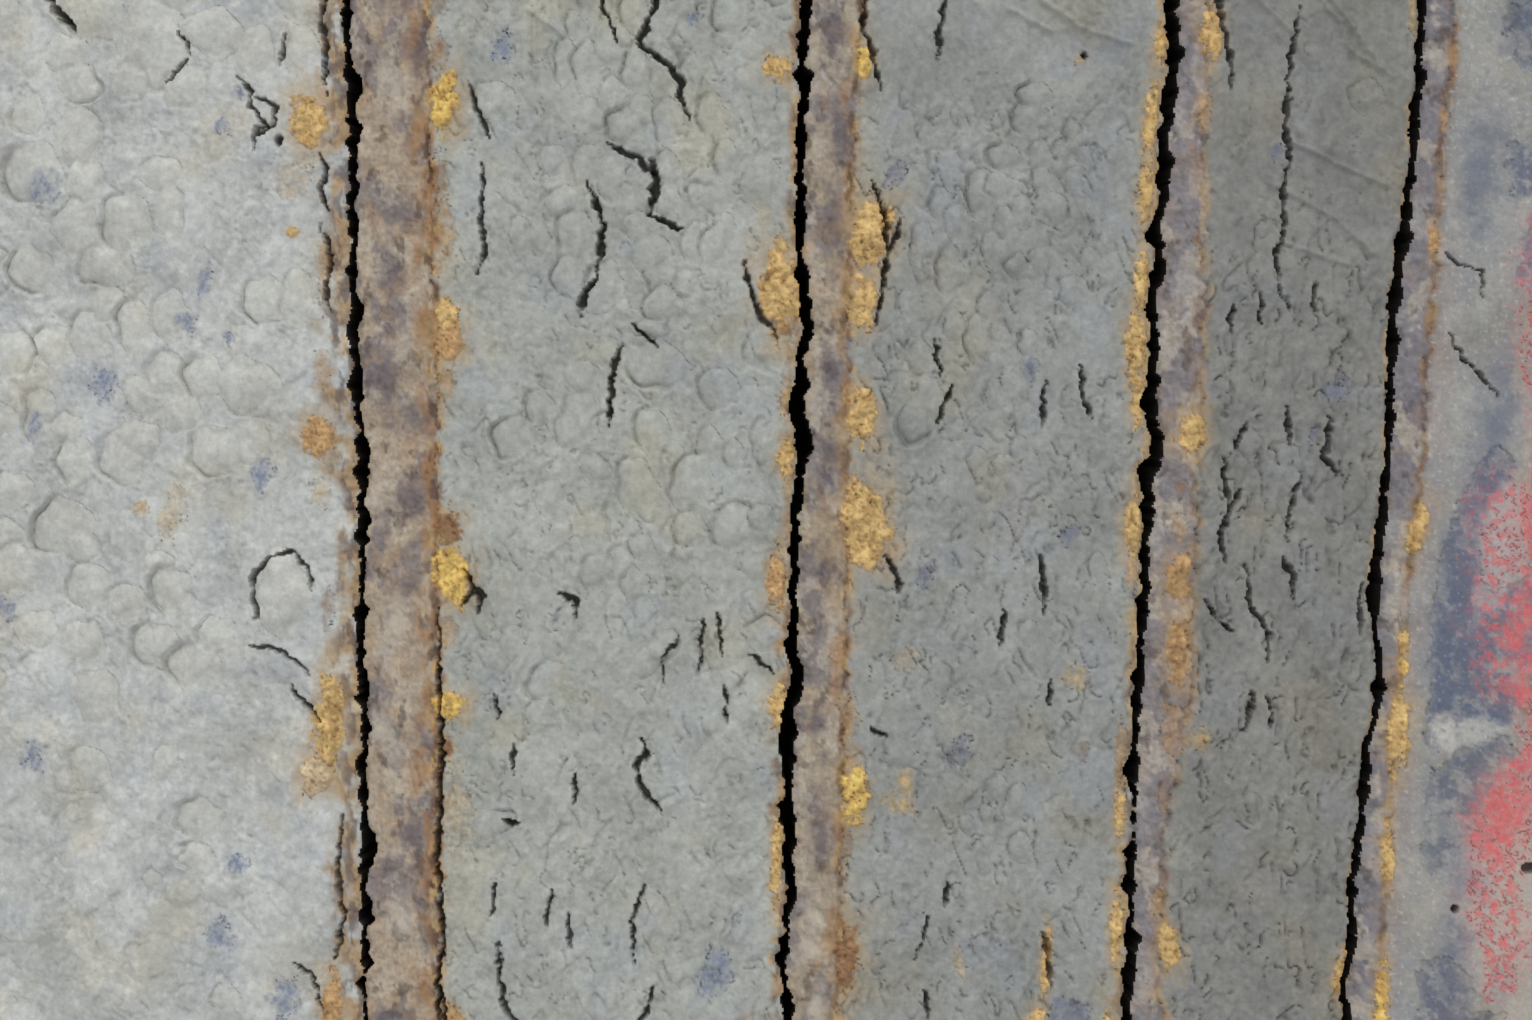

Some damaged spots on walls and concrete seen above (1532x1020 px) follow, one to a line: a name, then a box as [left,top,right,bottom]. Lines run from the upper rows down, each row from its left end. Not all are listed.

crack [600,0,691,122]
rust [758,235,804,347]
rust [846,201,897,328]
rust [1124,253,1149,430]
crack [235,0,378,1020]
rust [432,513,474,648]
crack [660,0,814,1020]
crack [1120,0,1235,1020]
crack [1203,405,1344,732]
crack [1338,0,1486,1020]
rust [431,692,478,861]
rust [770,819,785,911]